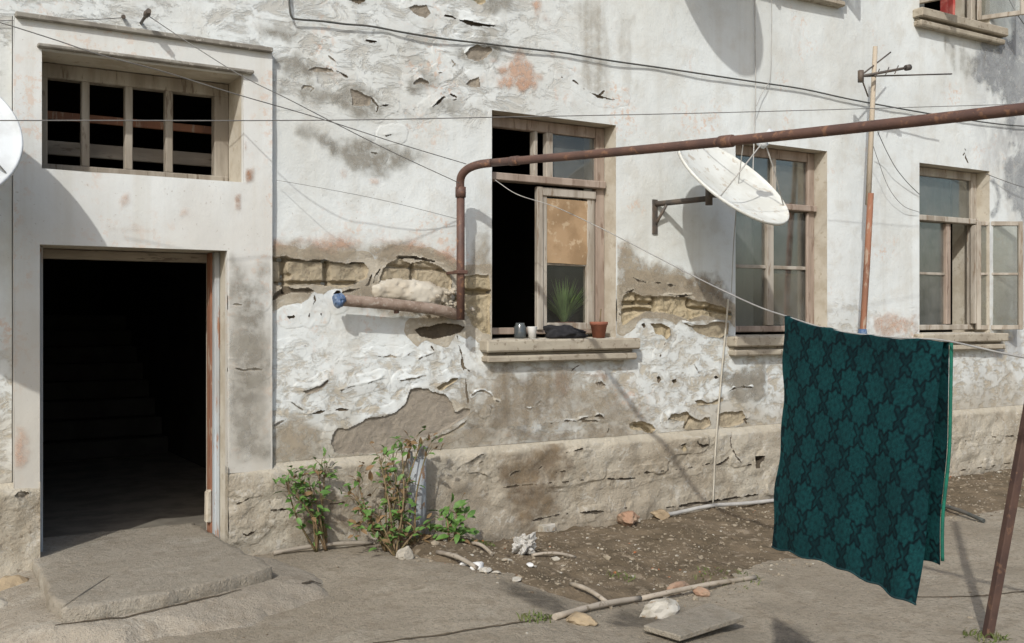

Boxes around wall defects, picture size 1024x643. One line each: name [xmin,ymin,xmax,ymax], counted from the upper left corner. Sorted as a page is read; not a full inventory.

spalling [296,44,379,119]
spalling [336,0,377,14]
peeling [399,0,536,97]
spalling [228,238,492,458]
flaking render [587,371,614,399]
spalling [616,288,749,435]
damp [502,432,566,520]